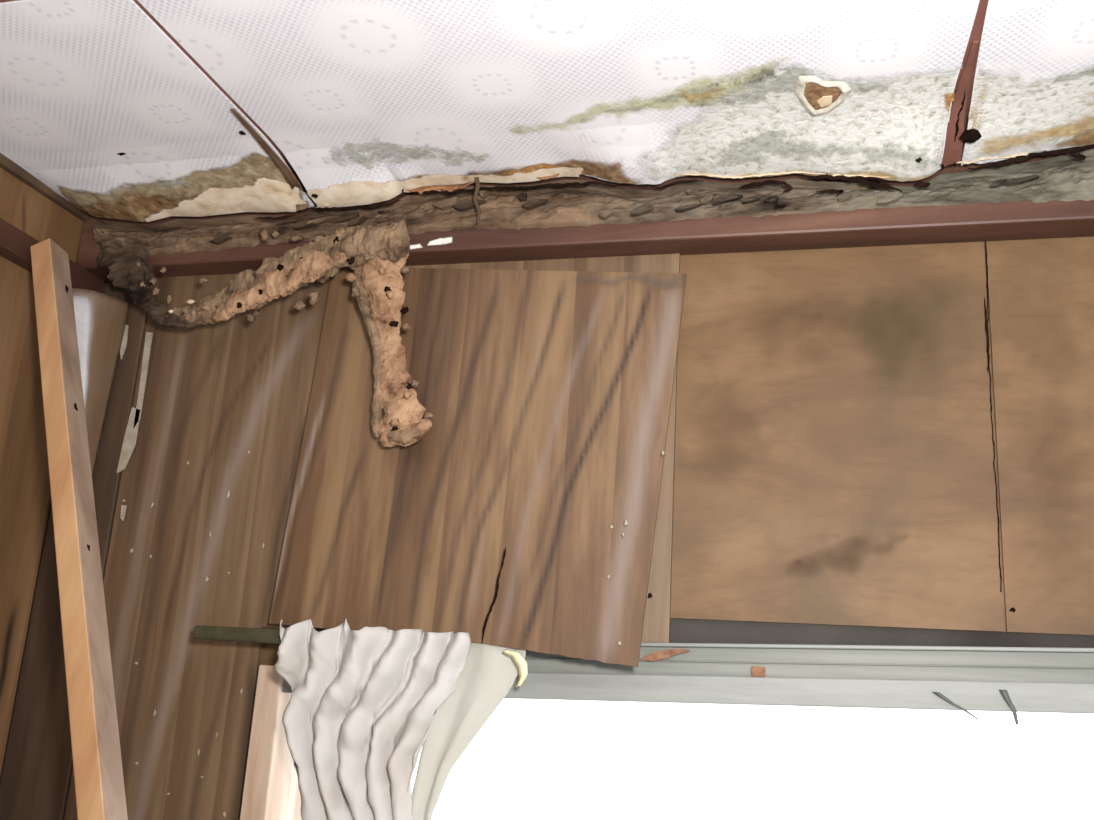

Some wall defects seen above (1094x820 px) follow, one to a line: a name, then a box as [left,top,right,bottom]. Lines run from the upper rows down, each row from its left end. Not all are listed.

water stain [539,62,958,181]
spalling [795,76,852,117]
water stain [966,66,1094,162]
peeling [230,108,335,242]
peeling [348,208,397,227]
water stain [332,143,638,184]
peeling [517,193,549,210]
peeling [675,194,779,213]
peeling [877,192,904,206]
peeling [989,175,1040,189]